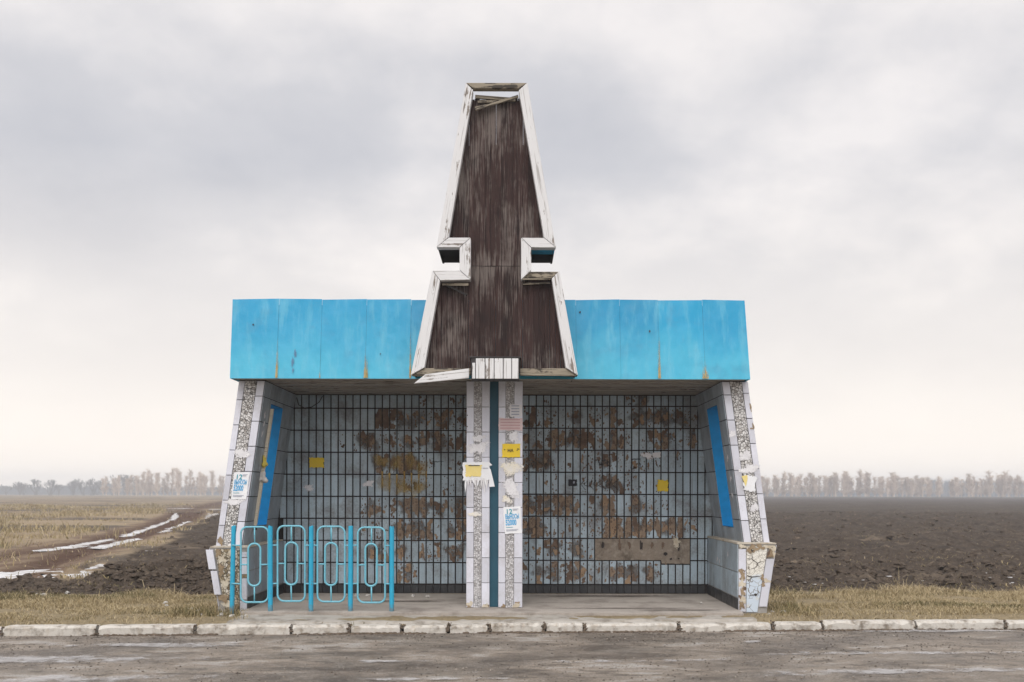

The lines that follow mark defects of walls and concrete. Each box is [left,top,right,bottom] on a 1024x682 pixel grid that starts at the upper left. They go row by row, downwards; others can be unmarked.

peeling [339,396,467,584]
peeling [522,396,697,584]
peeling [738,569,746,610]
spalling [739,544,776,558]